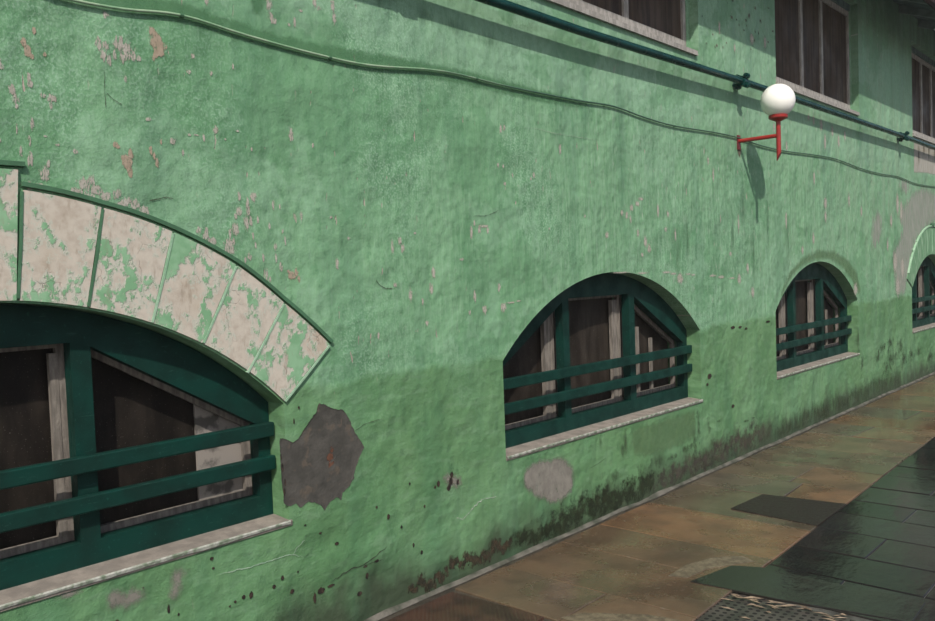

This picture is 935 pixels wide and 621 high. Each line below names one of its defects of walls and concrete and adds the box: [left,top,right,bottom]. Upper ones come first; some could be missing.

peeling [95,35,141,66]
peeling [149,27,167,62]
peeling [19,118,51,191]
peeling [71,175,149,214]
peeling [196,192,271,282]
spalling [279,403,364,510]
flaking render [524,458,573,502]
water stain [408,475,651,594]